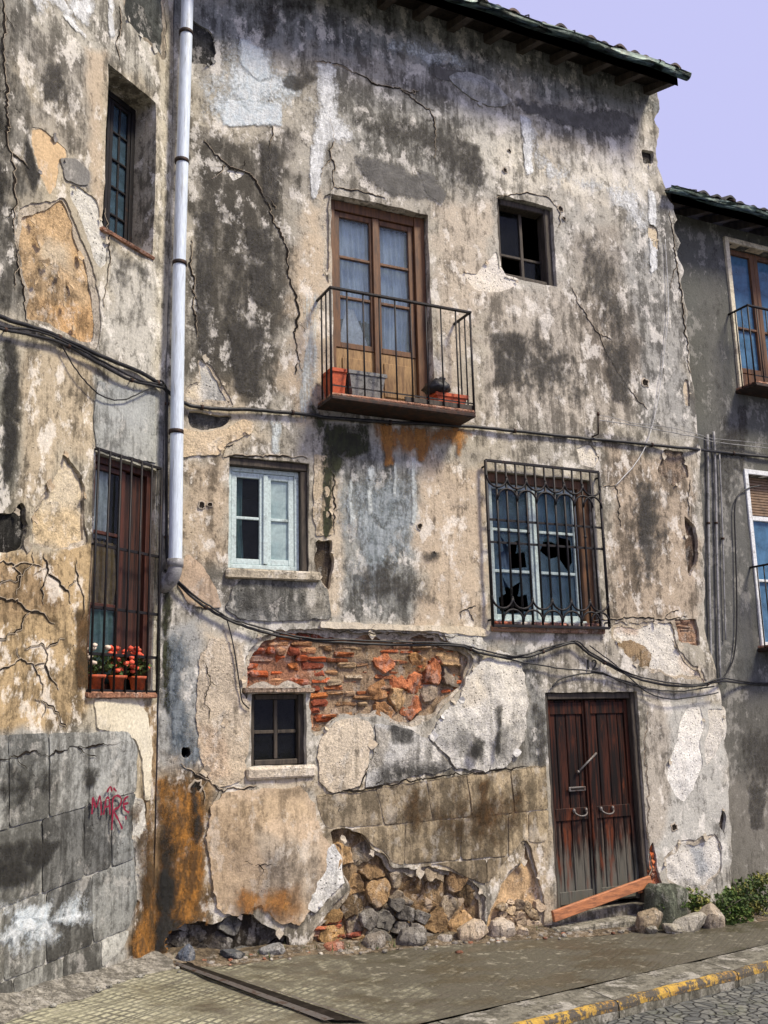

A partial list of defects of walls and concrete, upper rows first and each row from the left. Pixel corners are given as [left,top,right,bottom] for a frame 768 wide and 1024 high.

crack [0,0,28,322]
peeling [15,127,110,349]
damp [195,210,273,394]
crack [204,56,305,374]
damp [322,459,435,605]
rust [376,423,465,466]
damp [491,332,584,399]
crack [0,552,121,768]
spalling [241,629,475,736]
spalling [667,706,727,801]
rust [132,778,205,958]
spalling [307,828,547,943]